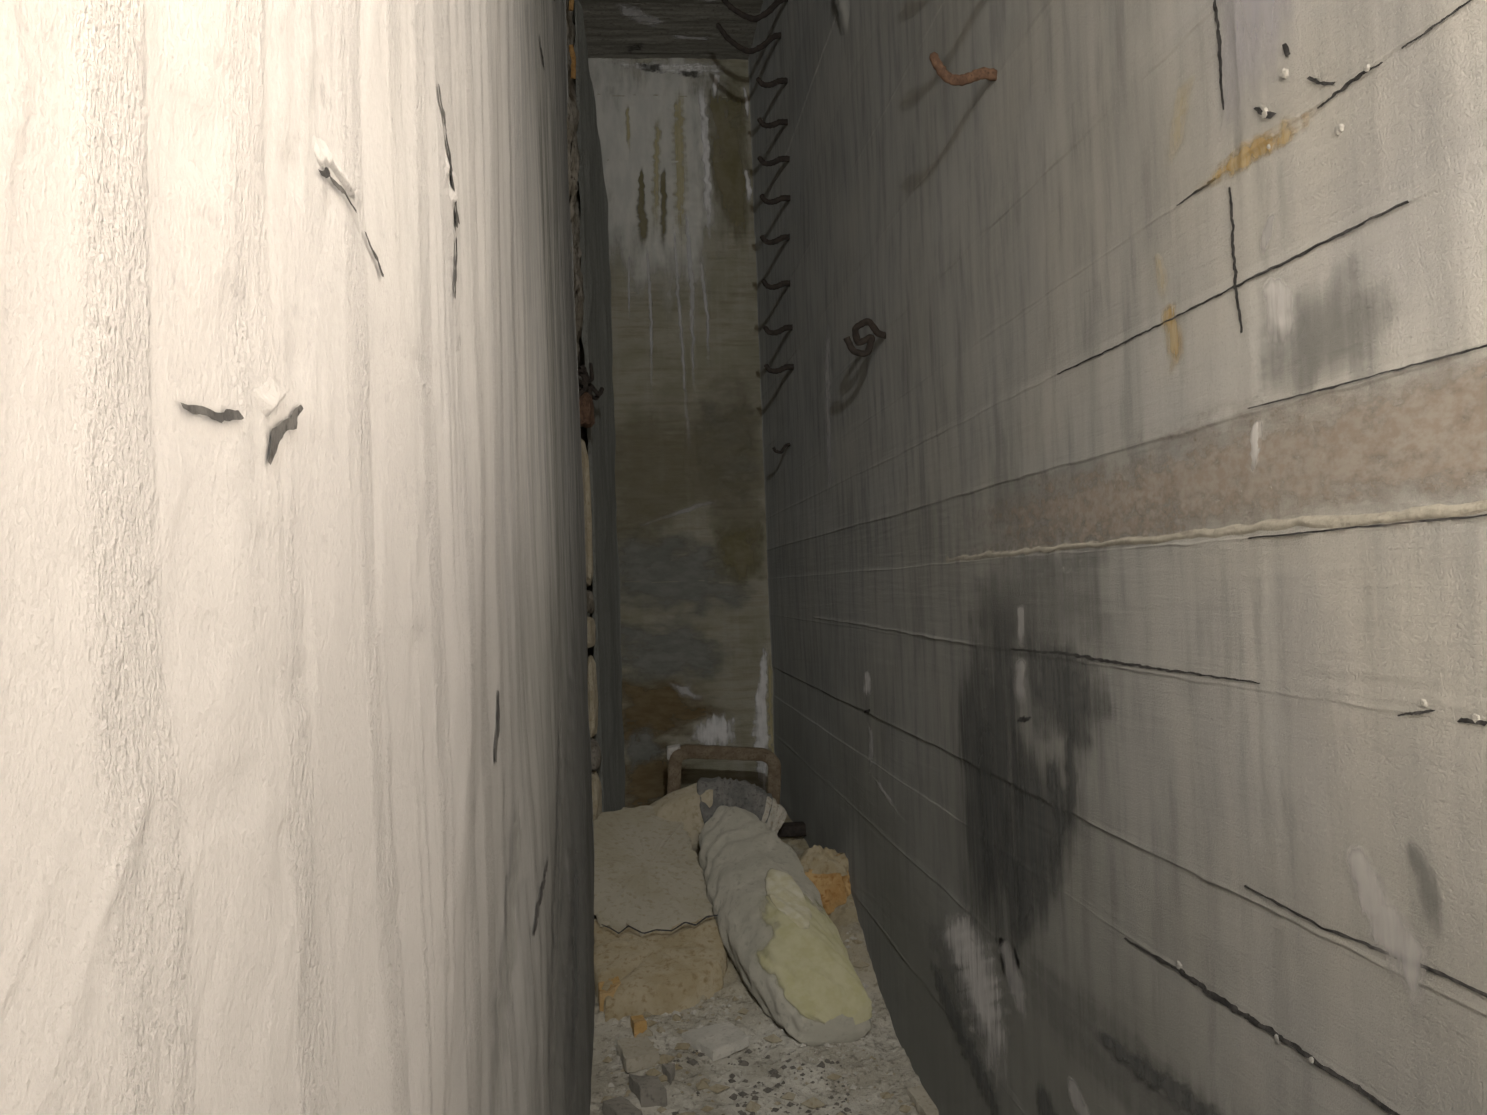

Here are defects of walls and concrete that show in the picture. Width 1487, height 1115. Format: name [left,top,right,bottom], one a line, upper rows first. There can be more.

damp [623,45,752,241]
crack [1213,0,1224,110]
crack [1057,187,1409,375]
damp [993,361,1487,548]
damp [934,607,1111,1115]